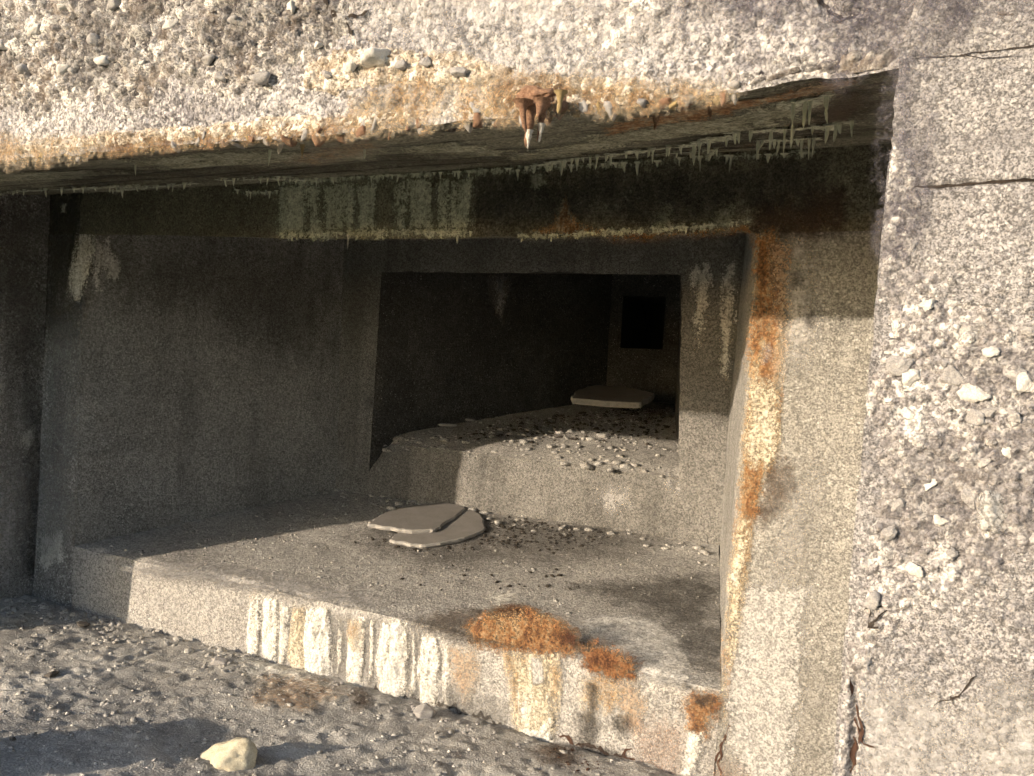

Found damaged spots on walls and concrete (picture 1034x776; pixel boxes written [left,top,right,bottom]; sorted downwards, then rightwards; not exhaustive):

leakage [374,0,661,61]
leakage [676,0,985,77]
leakage [0,86,880,338]
leakage [888,57,927,257]
crack [914,178,1034,188]
rust [533,195,792,776]
leakage [239,593,451,708]
leakage [487,590,518,606]
rust [419,603,644,727]
leakage [503,652,623,767]
leakage [571,575,721,671]